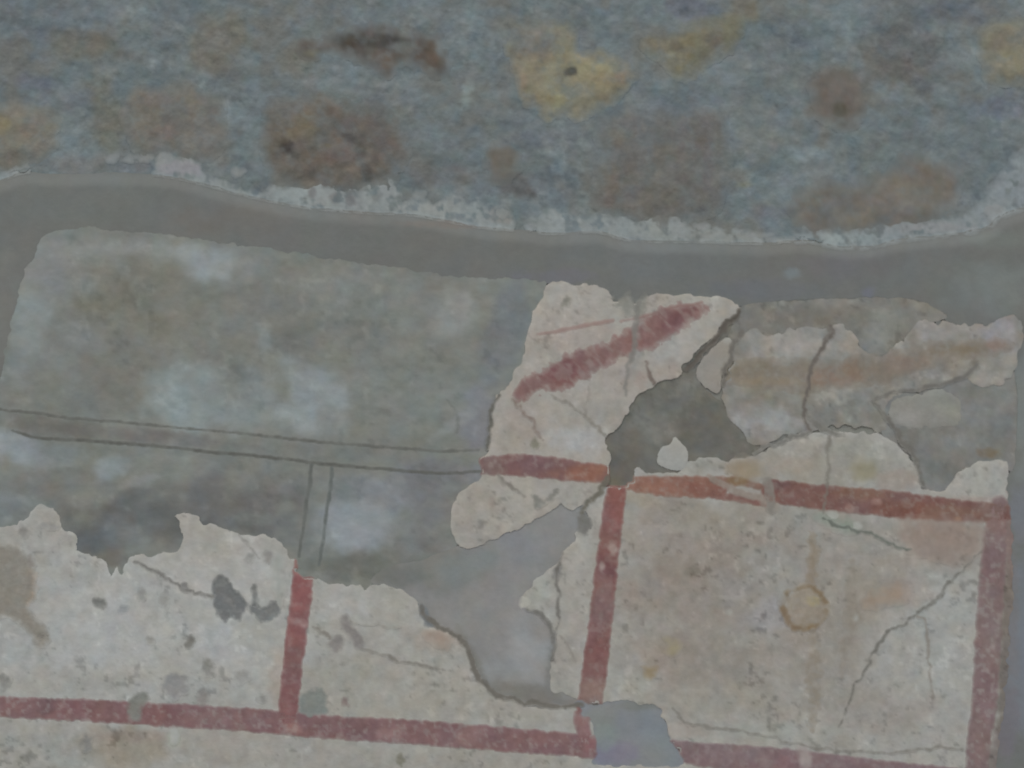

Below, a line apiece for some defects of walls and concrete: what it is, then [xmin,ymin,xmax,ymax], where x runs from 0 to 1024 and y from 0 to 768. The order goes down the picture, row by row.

leakage [295,20,453,81]
leakage [804,68,867,133]
leakage [103,140,1024,252]
crack [706,323,913,552]
crack [871,362,979,488]
spalling [530,488,560,510]
spalling [576,511,593,536]
spalling [327,613,366,653]
crack [671,550,983,756]
spalling [297,686,350,718]